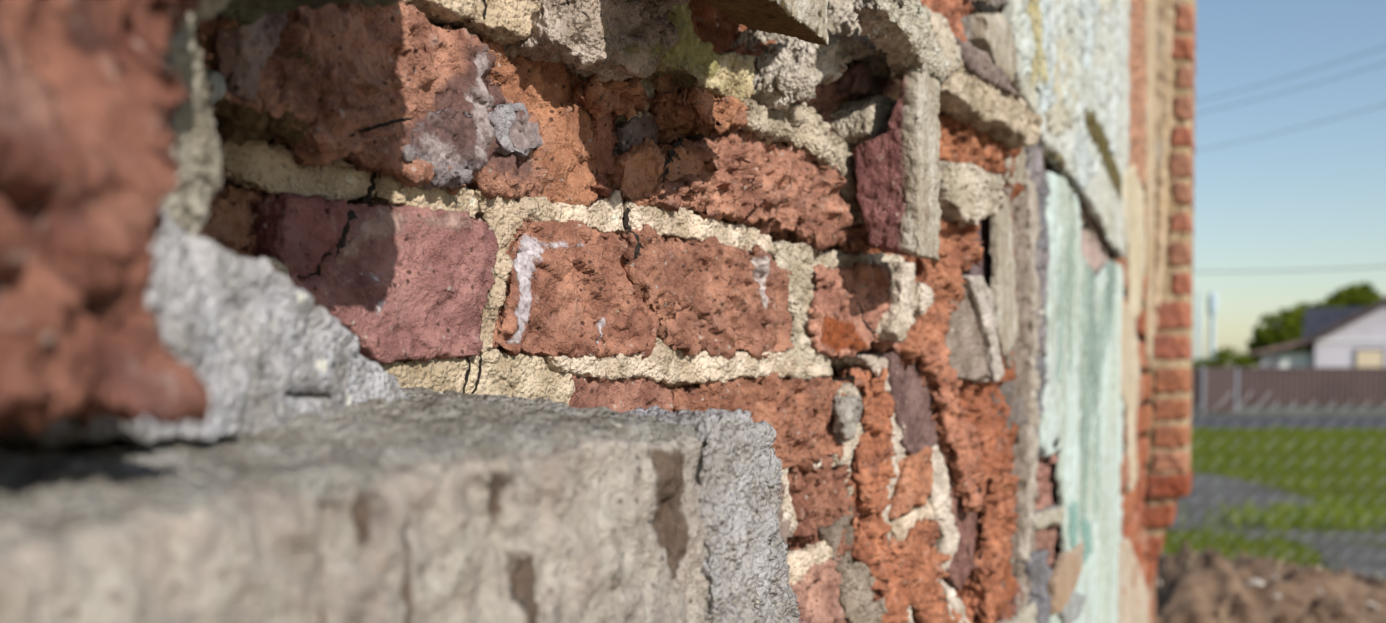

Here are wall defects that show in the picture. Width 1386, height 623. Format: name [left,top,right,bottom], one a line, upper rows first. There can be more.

crack [349,117,413,137]
crack [297,172,377,279]
crack [462,354,482,394]
peeling [1057,223,1117,561]